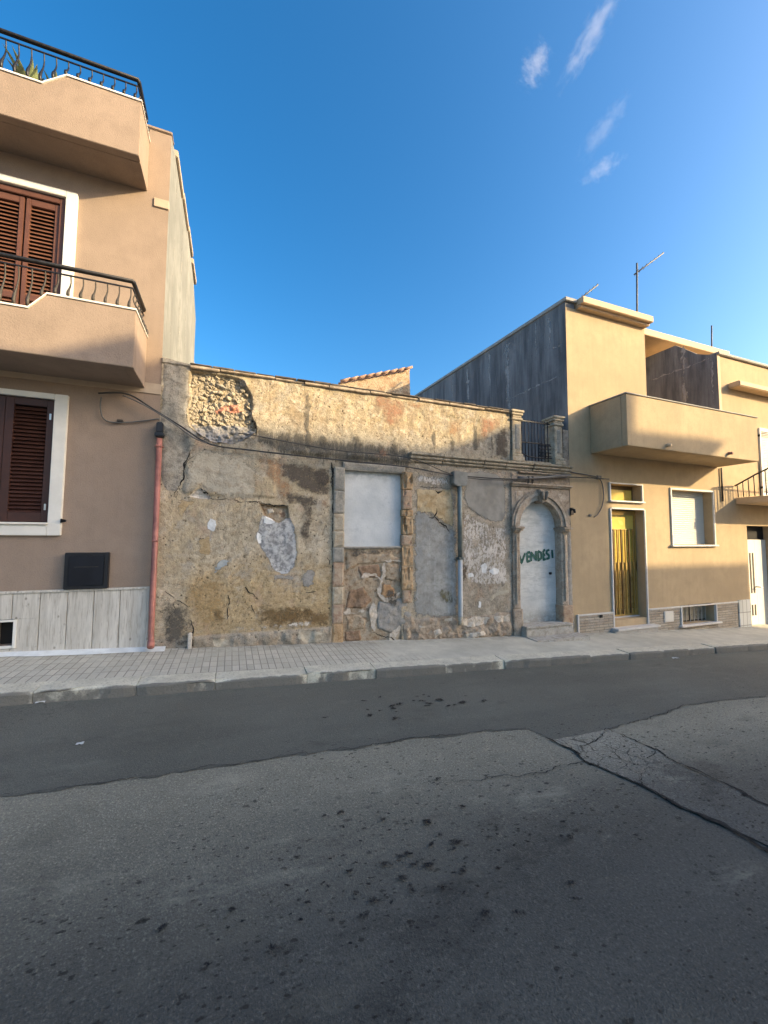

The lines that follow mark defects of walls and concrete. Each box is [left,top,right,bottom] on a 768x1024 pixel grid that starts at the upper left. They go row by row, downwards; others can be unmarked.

crack [174,452,285,507]
spalling [182,370,297,574]
damp [258,395,410,538]
spalling [389,475,512,640]
damp [164,583,222,645]
damp [251,607,328,630]
flaking render [369,601,377,632]